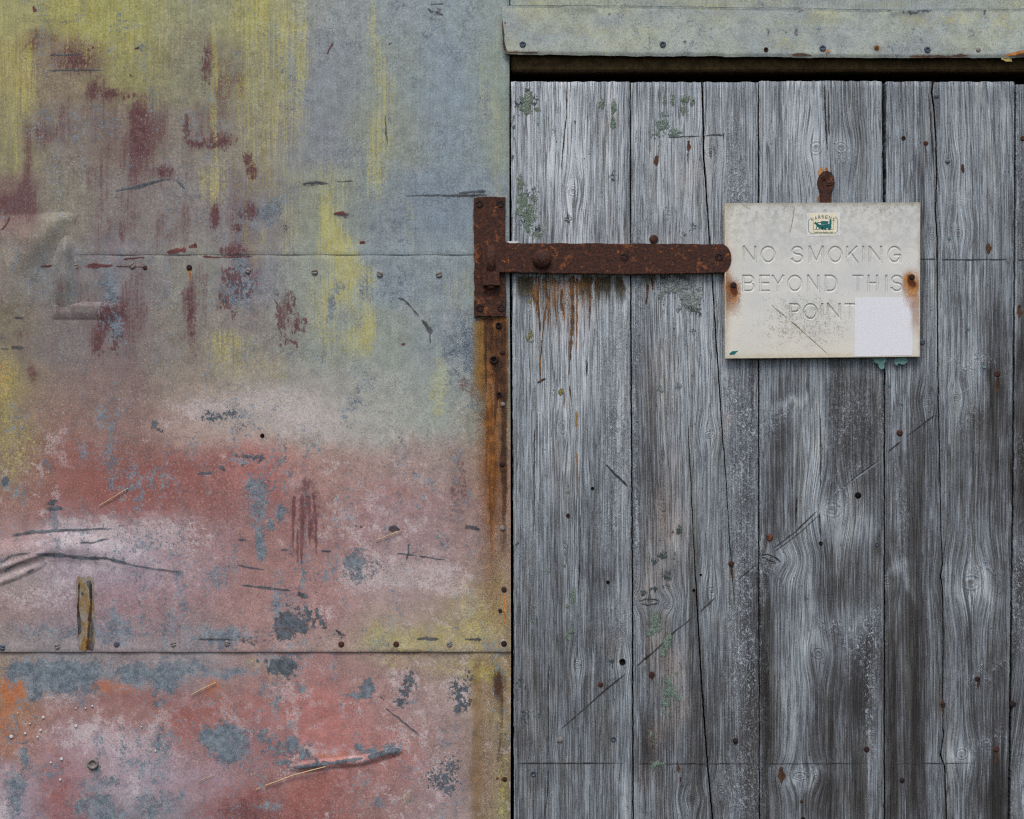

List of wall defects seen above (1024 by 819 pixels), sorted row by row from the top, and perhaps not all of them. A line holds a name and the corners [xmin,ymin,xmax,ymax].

rust [725,271,740,305]
rust [903,273,918,296]
rust [518,276,626,428]
rust [475,317,508,545]
crack [928,81,947,815]
peeling [340,547,384,585]
rust [76,576,95,651]
peeling [273,603,345,641]
crack [688,432,713,819]
peeling [0,657,198,709]
peeling [256,655,303,680]
peeling [191,719,315,771]